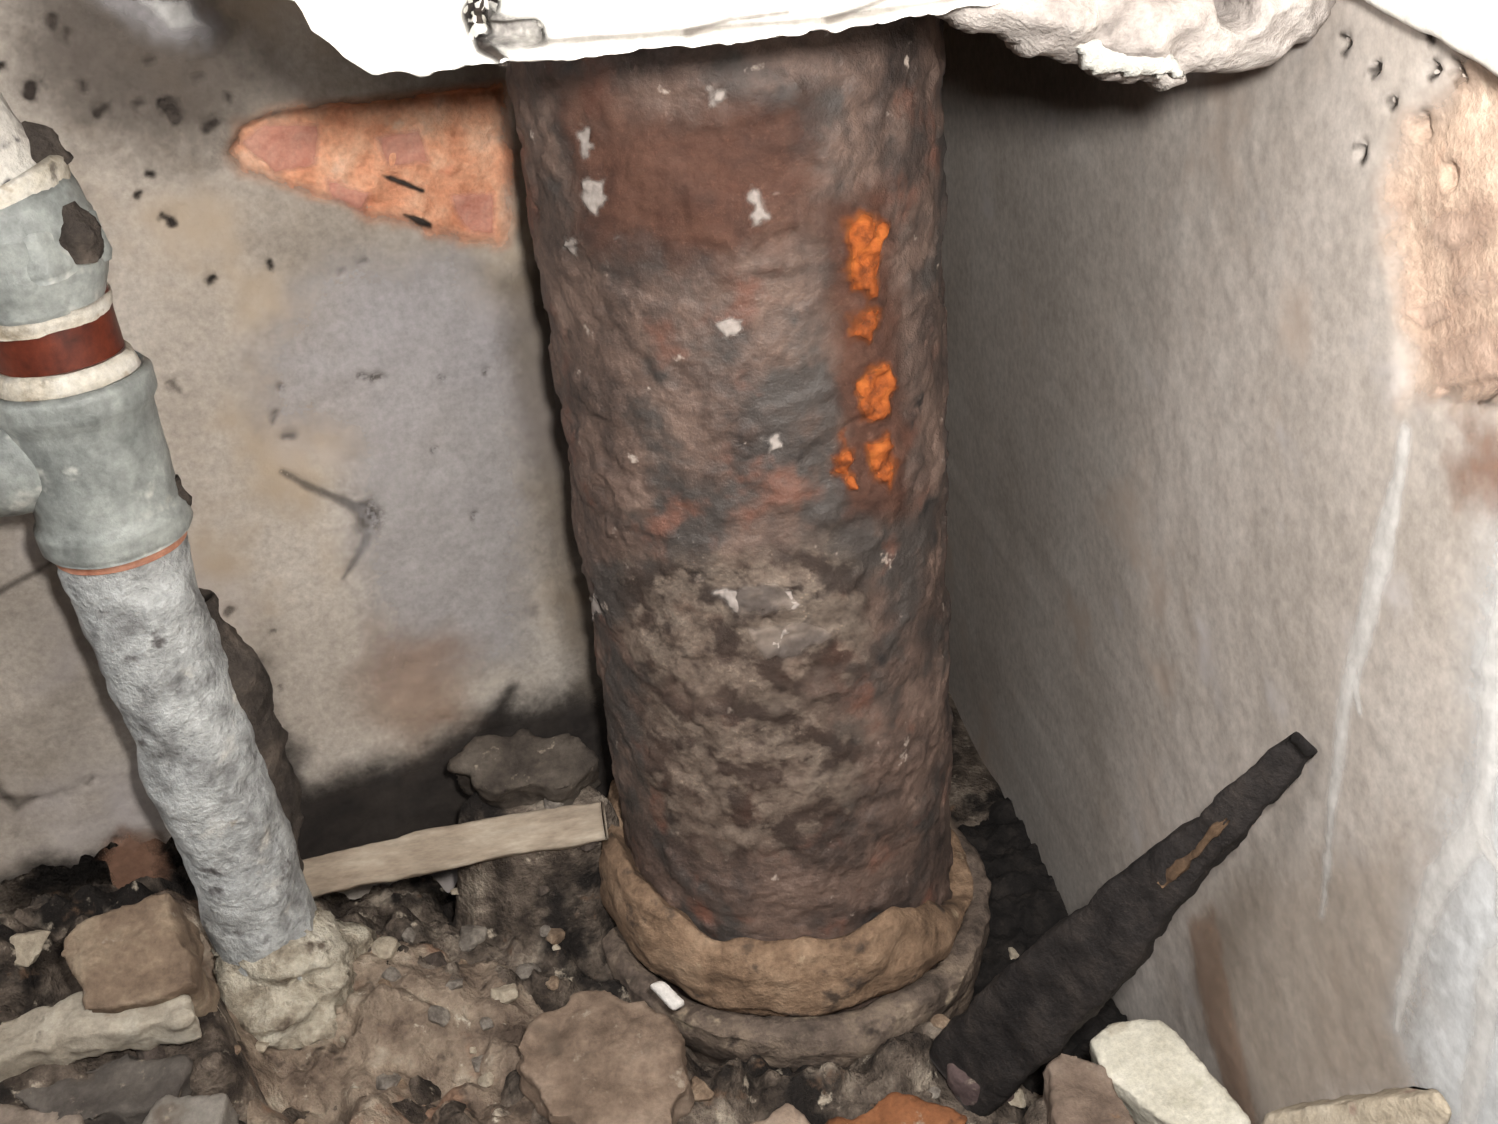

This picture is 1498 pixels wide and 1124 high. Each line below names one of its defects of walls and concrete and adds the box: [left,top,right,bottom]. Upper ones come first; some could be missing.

flaking render [230,84,513,246]
rust [834,196,905,512]
flaking render [1385,34,1498,401]
crack [282,471,379,571]